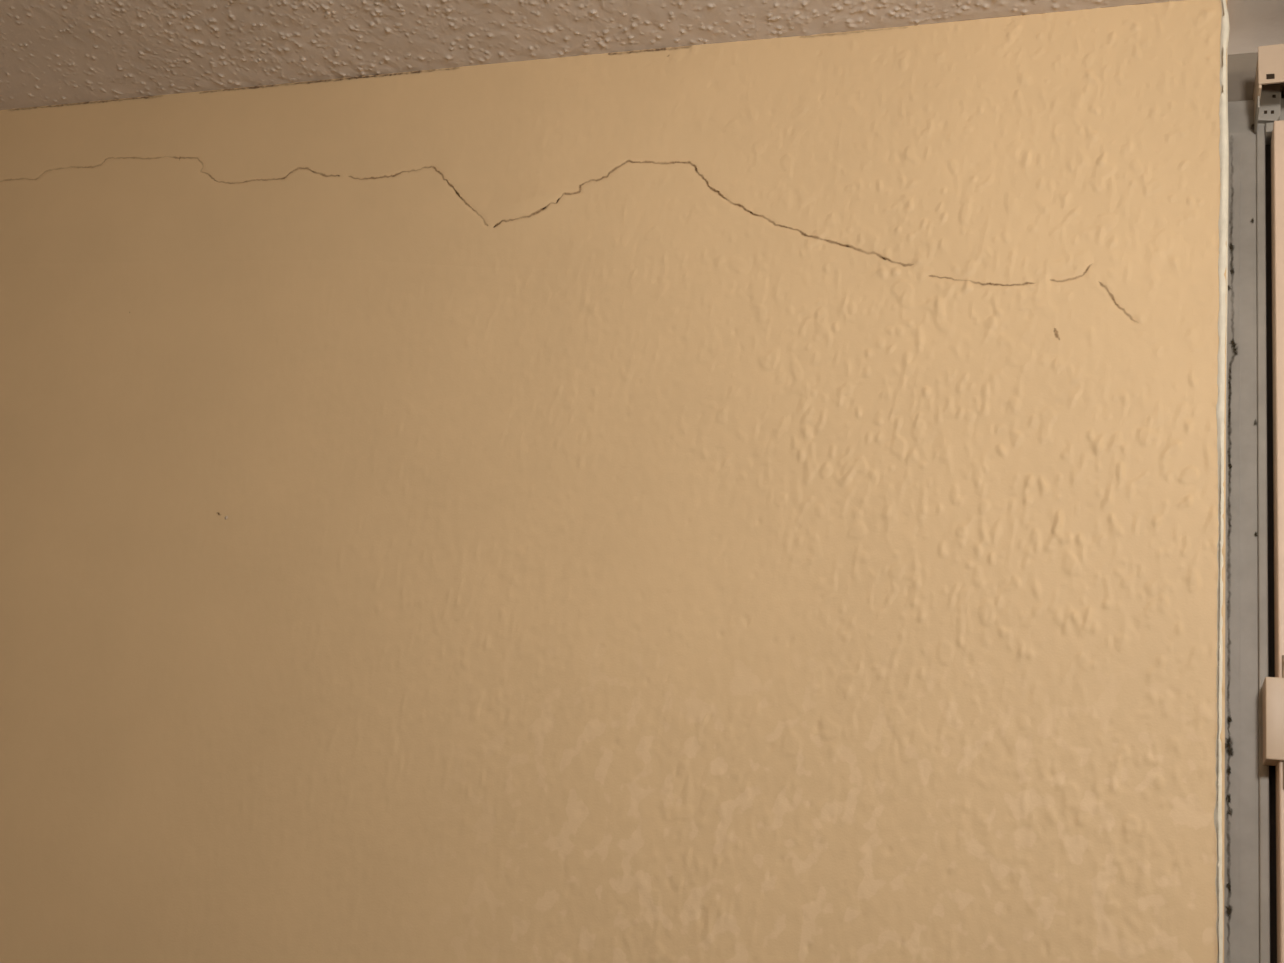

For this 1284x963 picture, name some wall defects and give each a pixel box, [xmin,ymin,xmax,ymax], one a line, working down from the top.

crack [684,162,849,246]